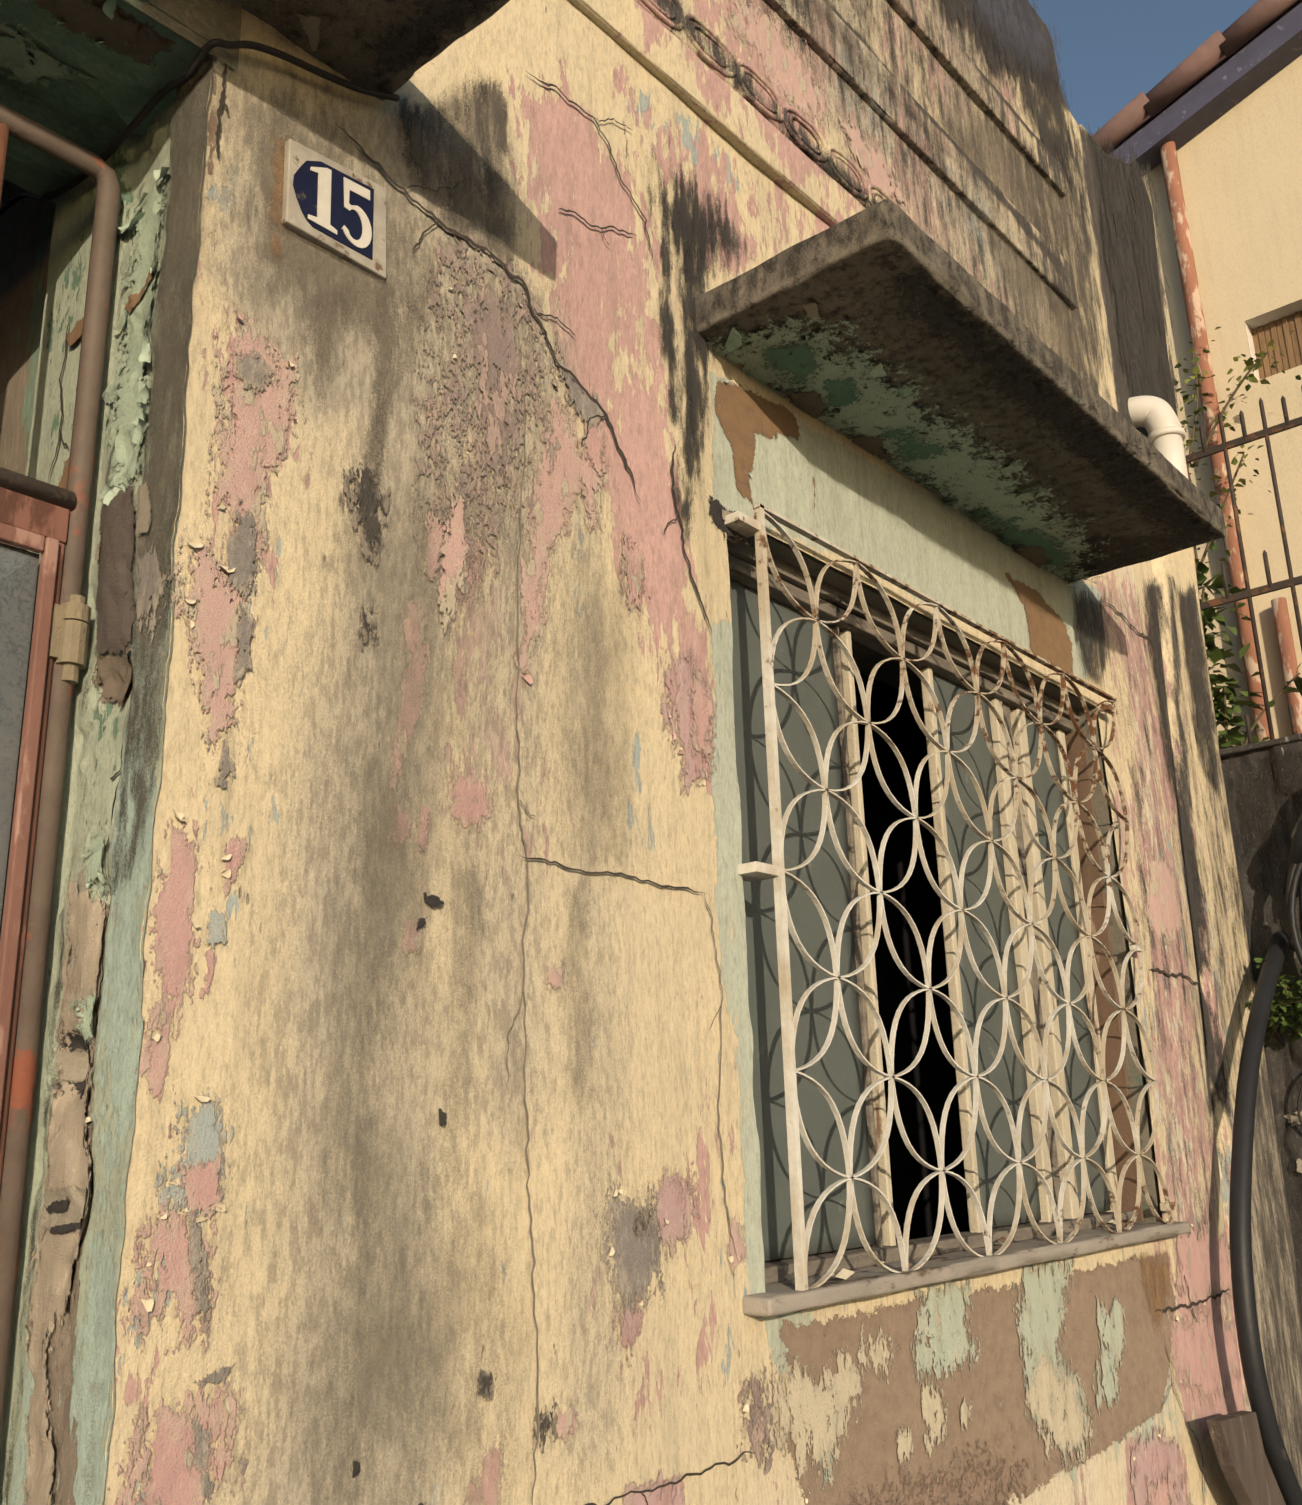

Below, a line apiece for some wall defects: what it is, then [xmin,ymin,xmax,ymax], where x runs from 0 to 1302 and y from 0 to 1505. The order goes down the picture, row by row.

crack [48,321,69,478]
crack [336,124,756,1505]
crack [526,71,653,261]
water stain [640,139,748,540]
peeling [707,302,1121,589]
water stain [856,0,1228,543]
water stain [1074,589,1110,686]
water stain [1141,577,1234,1122]
spalling [22,830,108,1505]
peeling [122,809,248,1356]
peeling [737,1219,1242,1505]
crack [1155,1289,1230,1500]